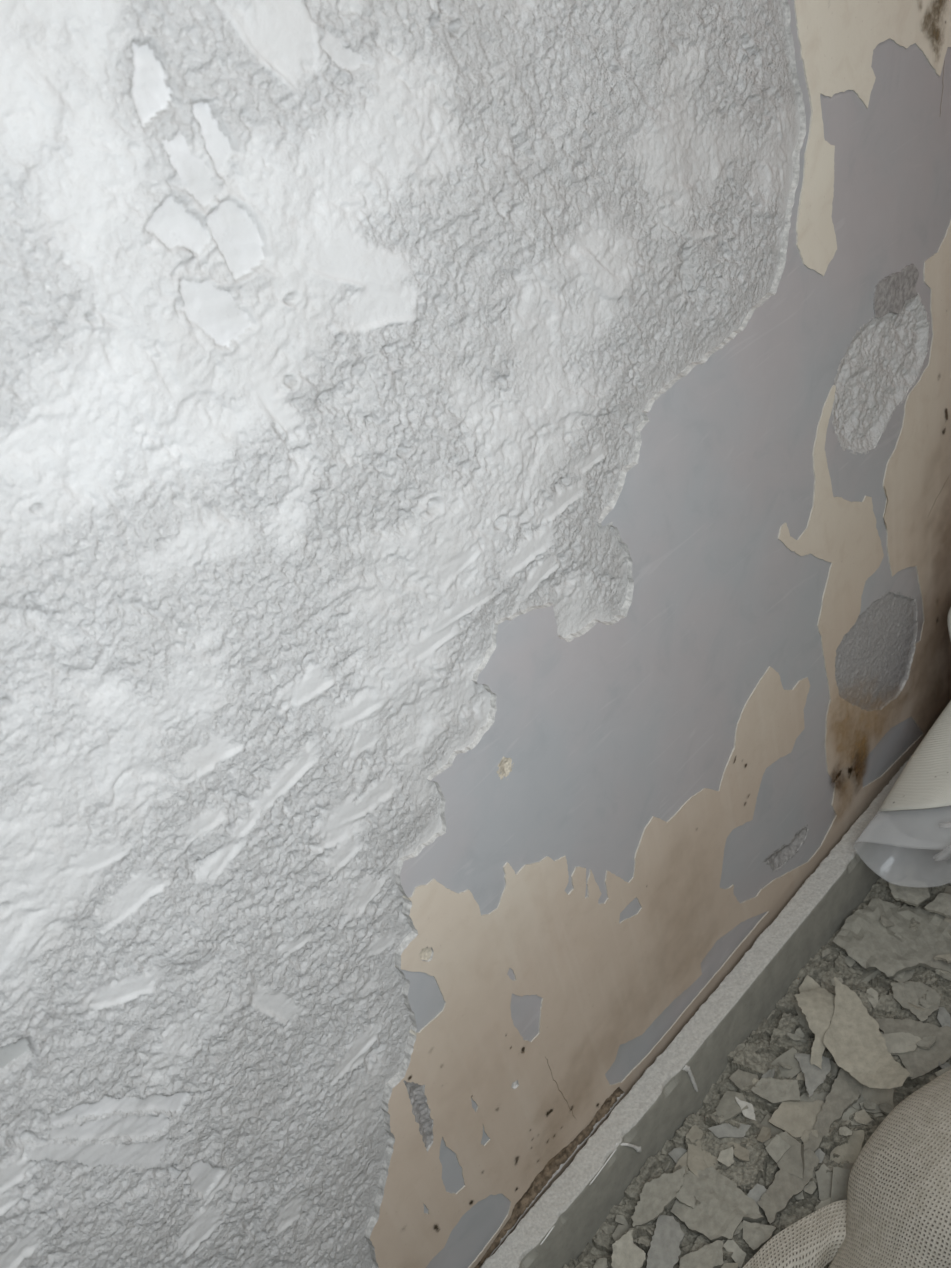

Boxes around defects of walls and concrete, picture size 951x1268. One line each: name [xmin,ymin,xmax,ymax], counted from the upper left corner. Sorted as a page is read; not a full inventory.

leakage [924,0,943,40]
flaking render [131,42,174,128]
flaking render [162,131,221,206]
flaking render [192,101,233,174]
flaking render [145,195,213,254]
flaking render [206,199,265,280]
flaking render [180,279,252,347]
peeling [395,0,951,918]
flaking render [49,1114,169,1140]
flaking render [49,1092,190,1126]
peeling [426,912,767,1268]
flaking render [585,969,951,1268]